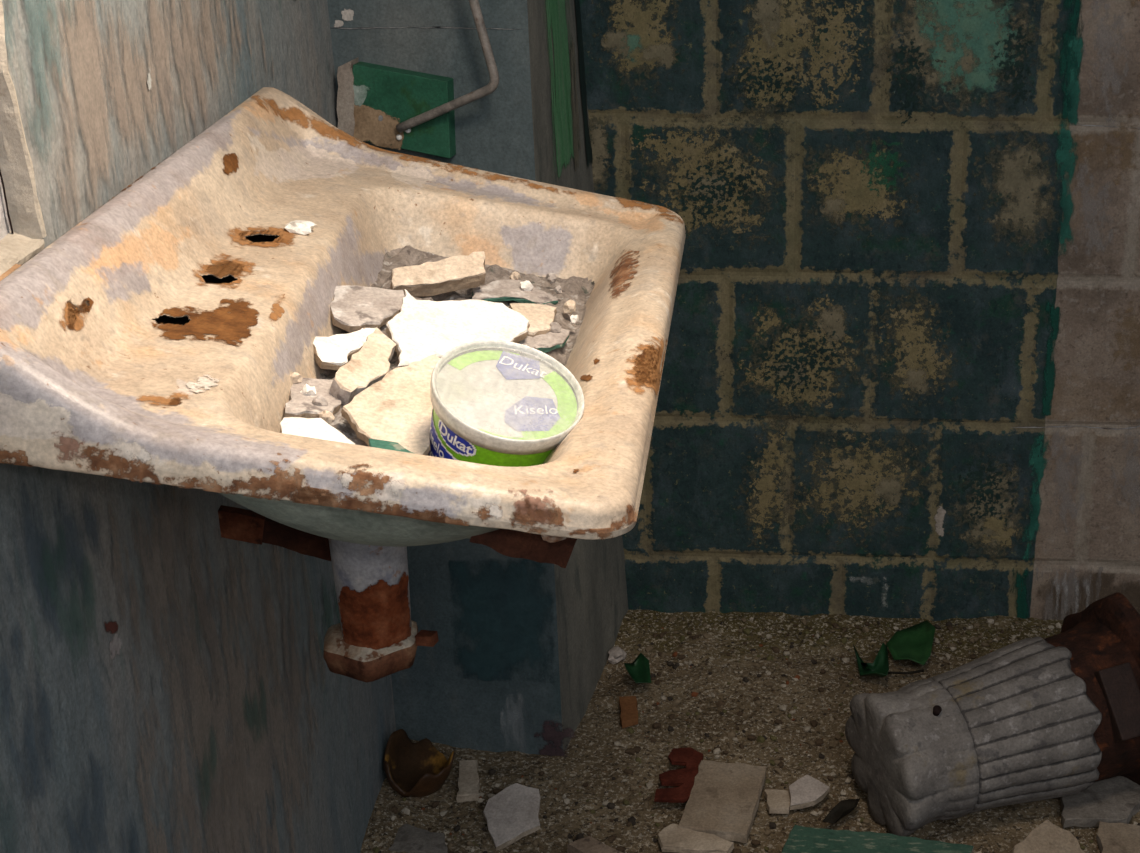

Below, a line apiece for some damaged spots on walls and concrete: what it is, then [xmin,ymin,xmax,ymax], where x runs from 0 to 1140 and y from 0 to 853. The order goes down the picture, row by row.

crack [0,170,14,234]
peeling [589,0,1065,260]
peeling [720,273,1032,572]
damp [1039,567,1140,620]